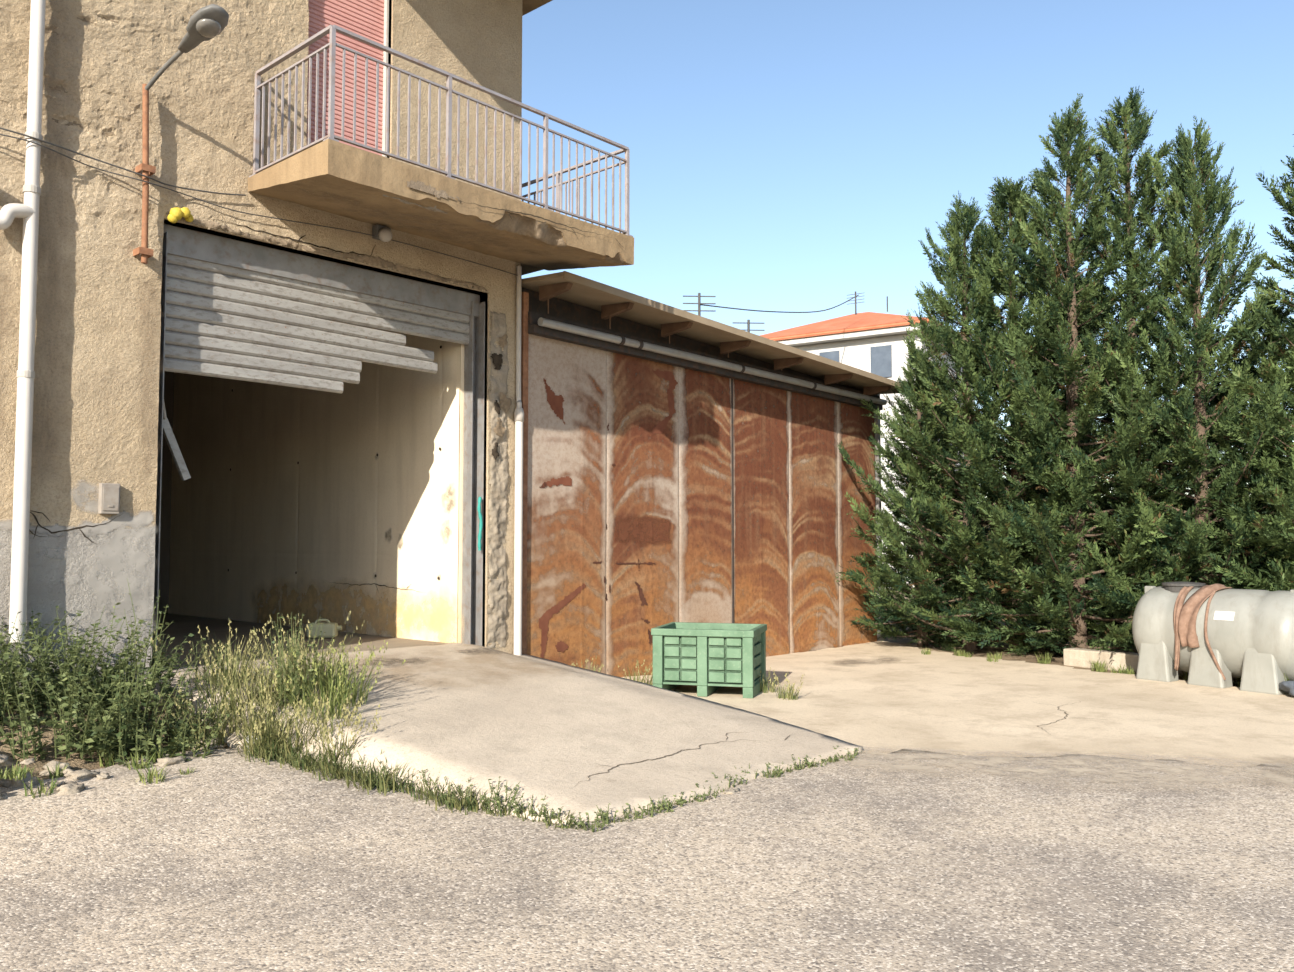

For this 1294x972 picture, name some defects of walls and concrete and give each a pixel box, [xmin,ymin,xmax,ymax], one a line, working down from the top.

spalling [475,212,567,247]
spalling [591,254,624,265]
spalling [491,334,508,370]
spalling [492,392,512,460]
rust [527,352,877,677]
peeling [29,511,153,633]
damp [257,586,454,643]
crack [576,732,790,785]